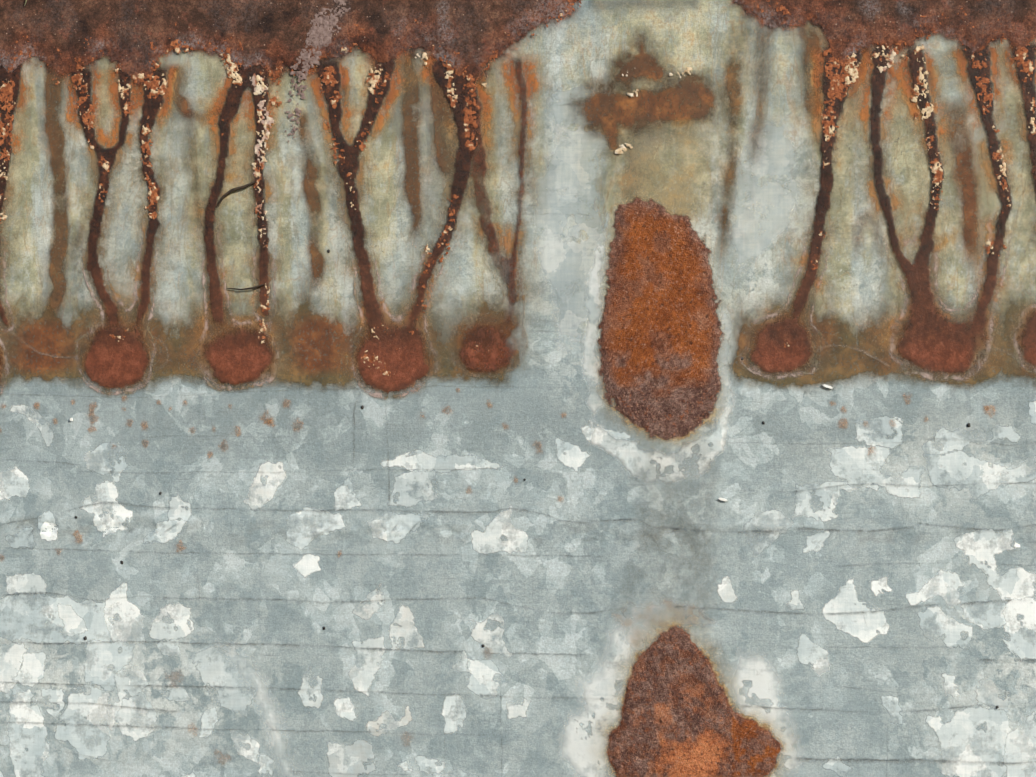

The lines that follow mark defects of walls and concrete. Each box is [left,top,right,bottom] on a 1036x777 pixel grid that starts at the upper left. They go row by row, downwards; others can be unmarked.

corrosion [0,0,581,399]
corrosion [575,34,742,240]
corrosion [598,197,725,441]
corrosion [733,0,1036,381]
corrosion [606,622,784,777]